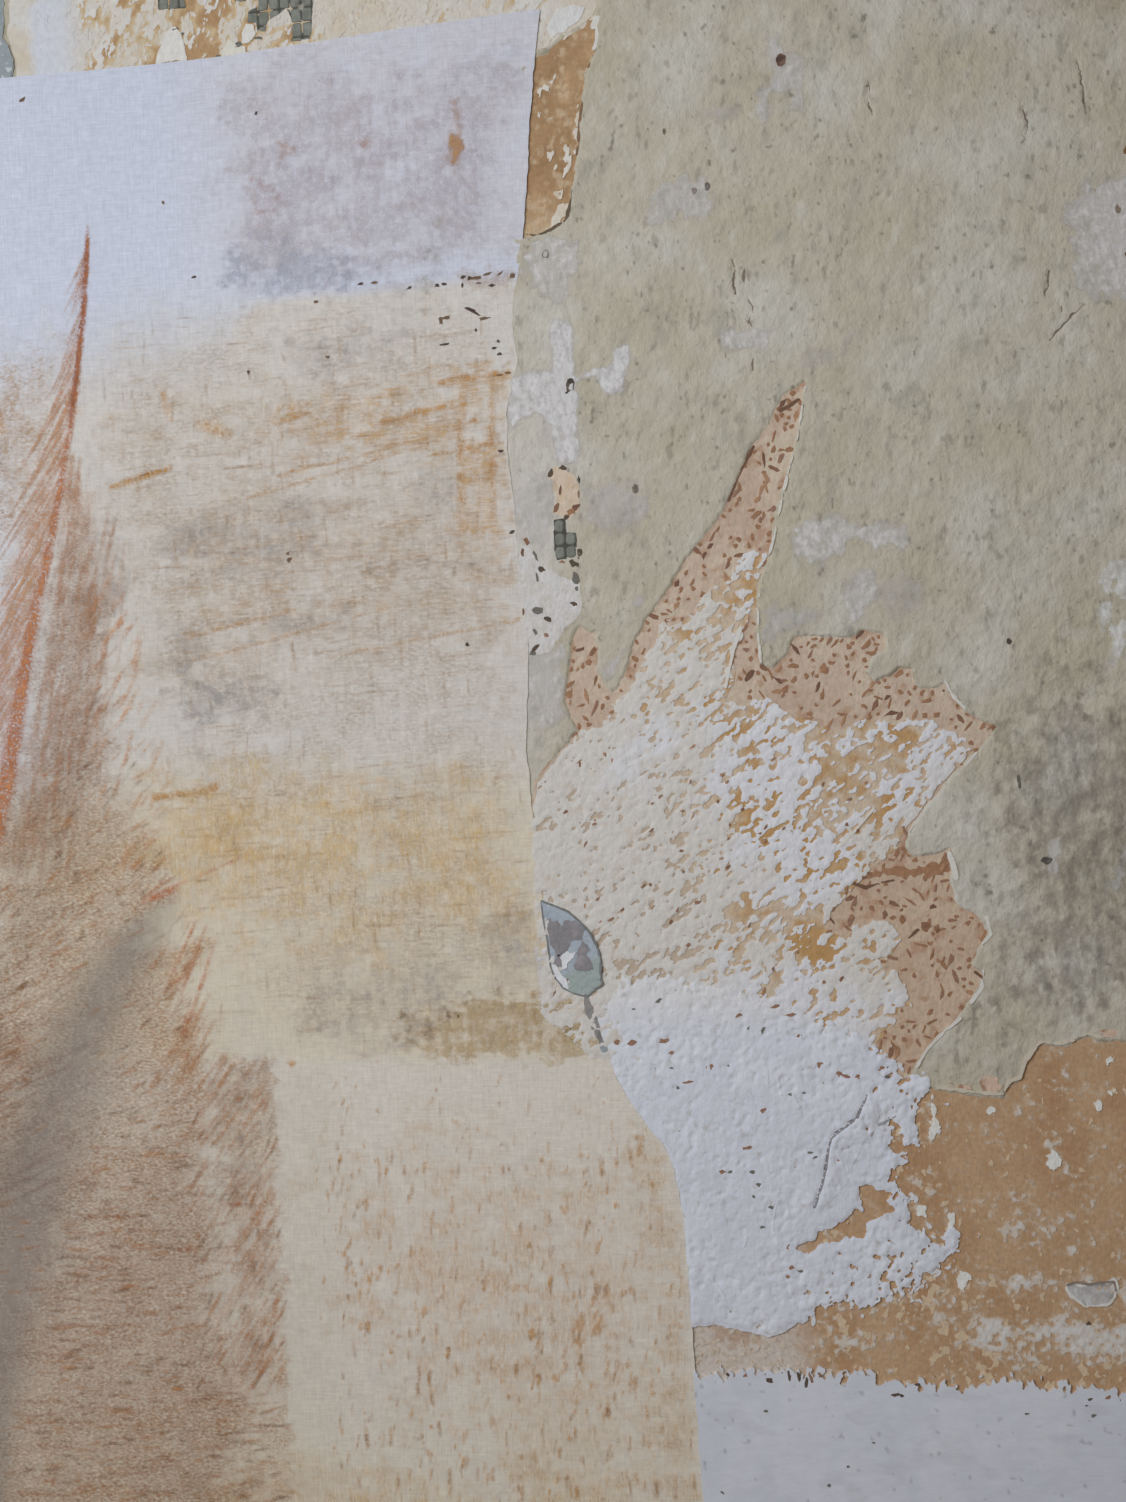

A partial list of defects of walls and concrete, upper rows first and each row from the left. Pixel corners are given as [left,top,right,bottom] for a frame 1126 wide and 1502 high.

peeling [0,0,600,258]
corrosion [0,238,107,861]
corrosion [0,844,204,1304]
peeling [509,382,1126,1401]
corrosion [58,1336,261,1502]